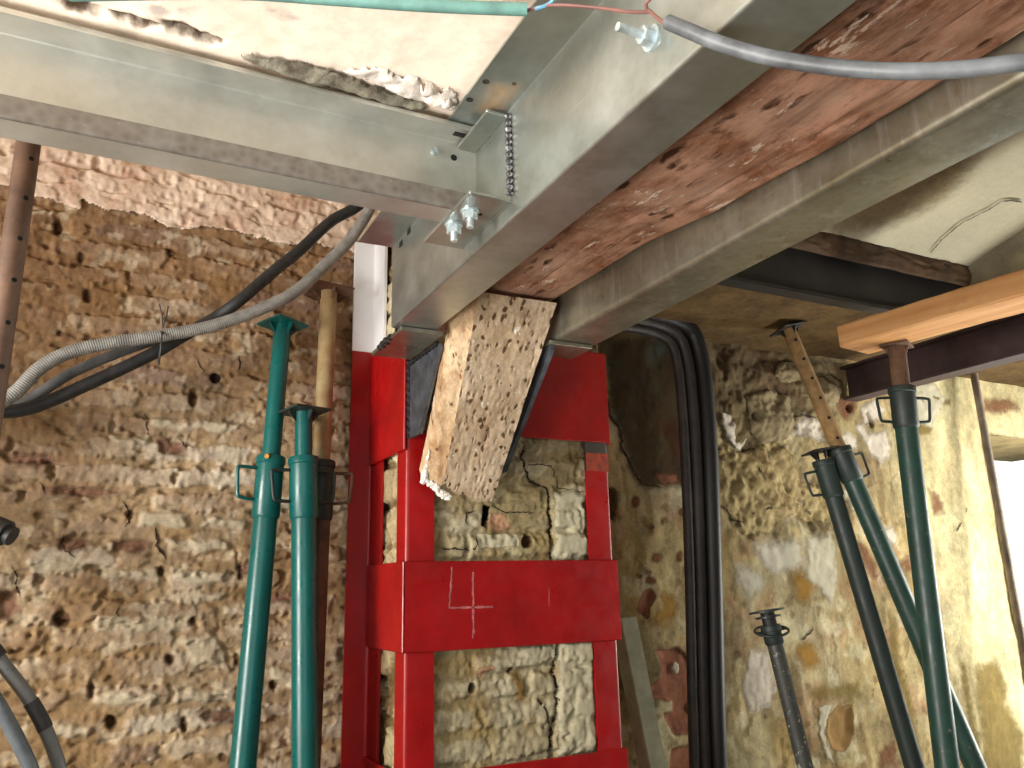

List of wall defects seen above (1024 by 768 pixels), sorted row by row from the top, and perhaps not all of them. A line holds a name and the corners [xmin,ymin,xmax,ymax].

peeling [342,66,458,111]
peeling [0,137,16,186]
peeling [34,145,378,253]
crack [930,199,1022,253]
crack [155,527,166,559]
crack [442,448,584,559]
crack [608,398,662,488]
spalling [719,413,830,536]
water stain [738,542,813,600]
crack [537,644,560,758]
spalling [651,647,689,768]